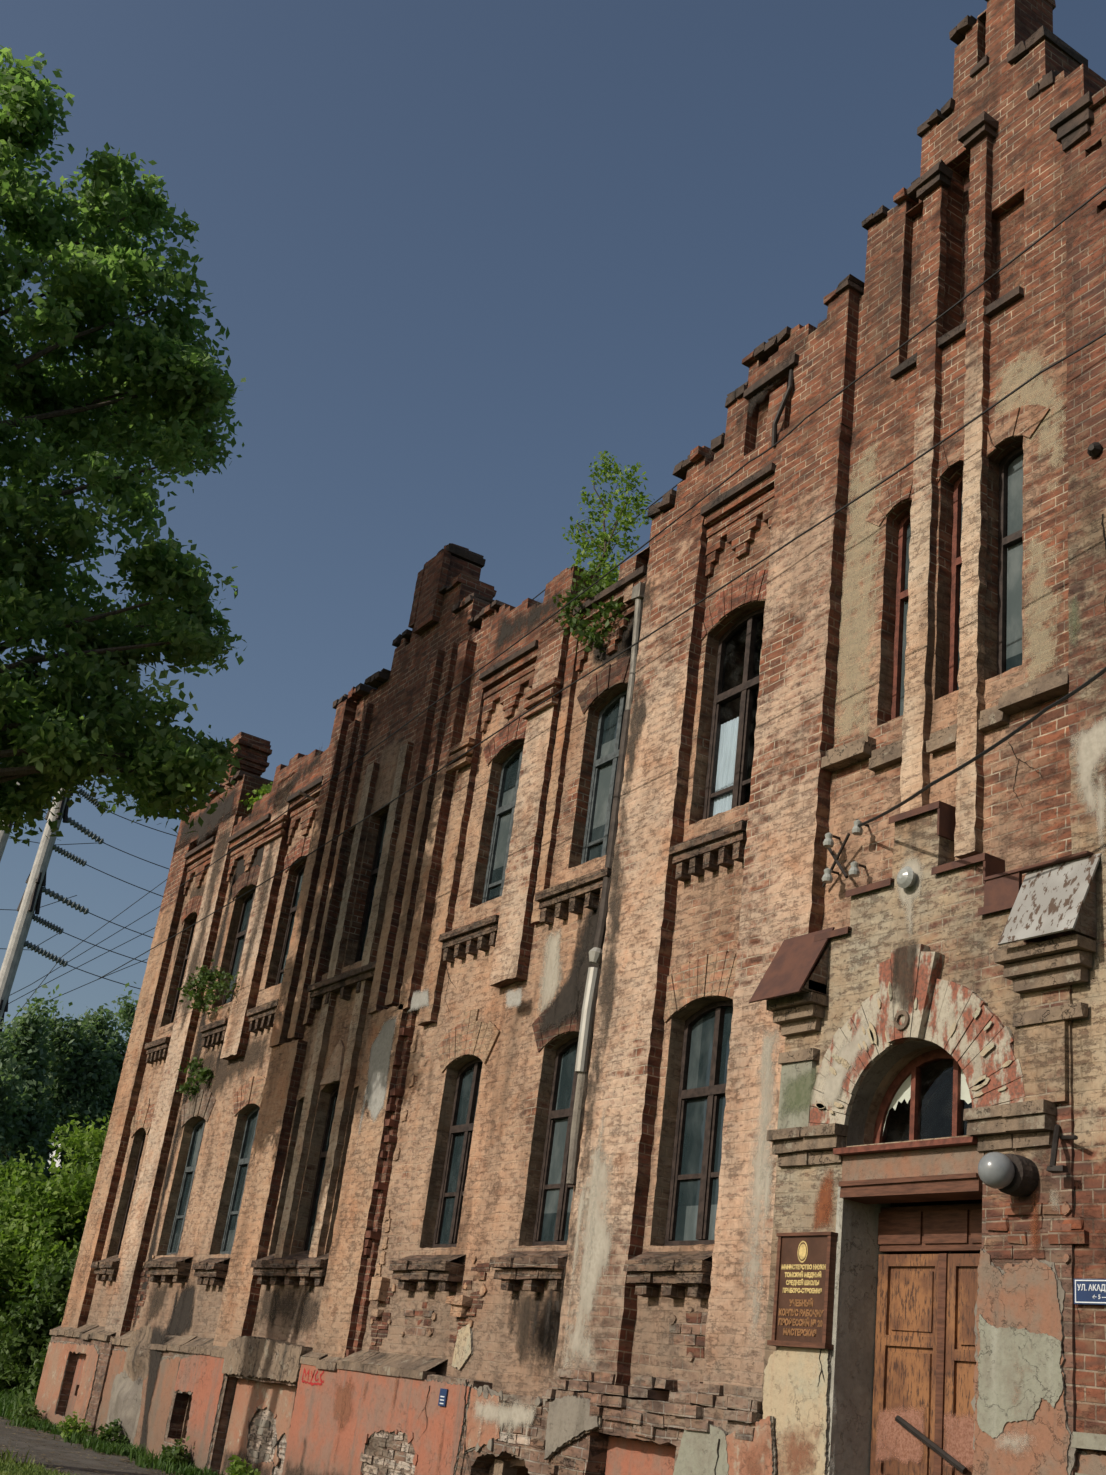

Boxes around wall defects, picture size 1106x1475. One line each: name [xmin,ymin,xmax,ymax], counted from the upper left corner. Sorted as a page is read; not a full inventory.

leakage [625,680,646,782]
leakage [1075,719,1106,843]
leakage [510,805,626,1369]
peeling [815,981,893,1114]
peeling [948,1007,995,1056]
peeling [971,1060,1012,1097]
spalling [243,1407,286,1467]
spalling [357,1429,418,1475]